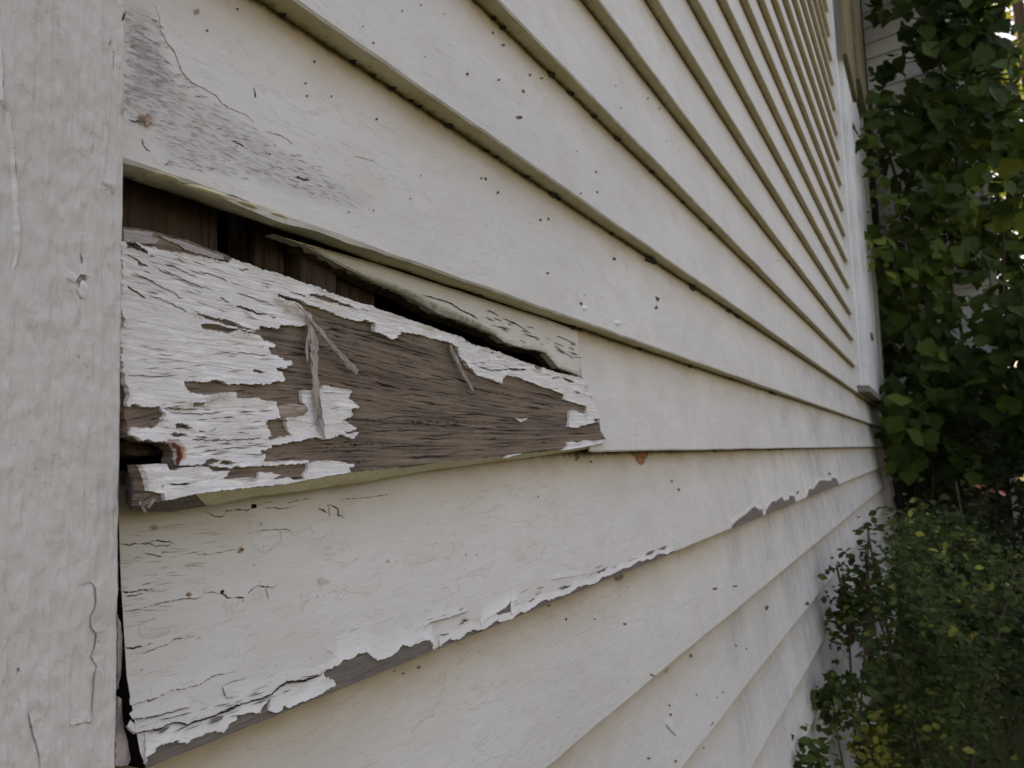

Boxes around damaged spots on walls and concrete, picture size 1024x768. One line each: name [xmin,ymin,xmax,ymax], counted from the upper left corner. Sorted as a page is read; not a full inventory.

crack [109,4,350,202]
peeling [120,229,608,501]
crack [70,487,393,734]
peeling [115,546,675,768]
peeling [731,473,839,529]